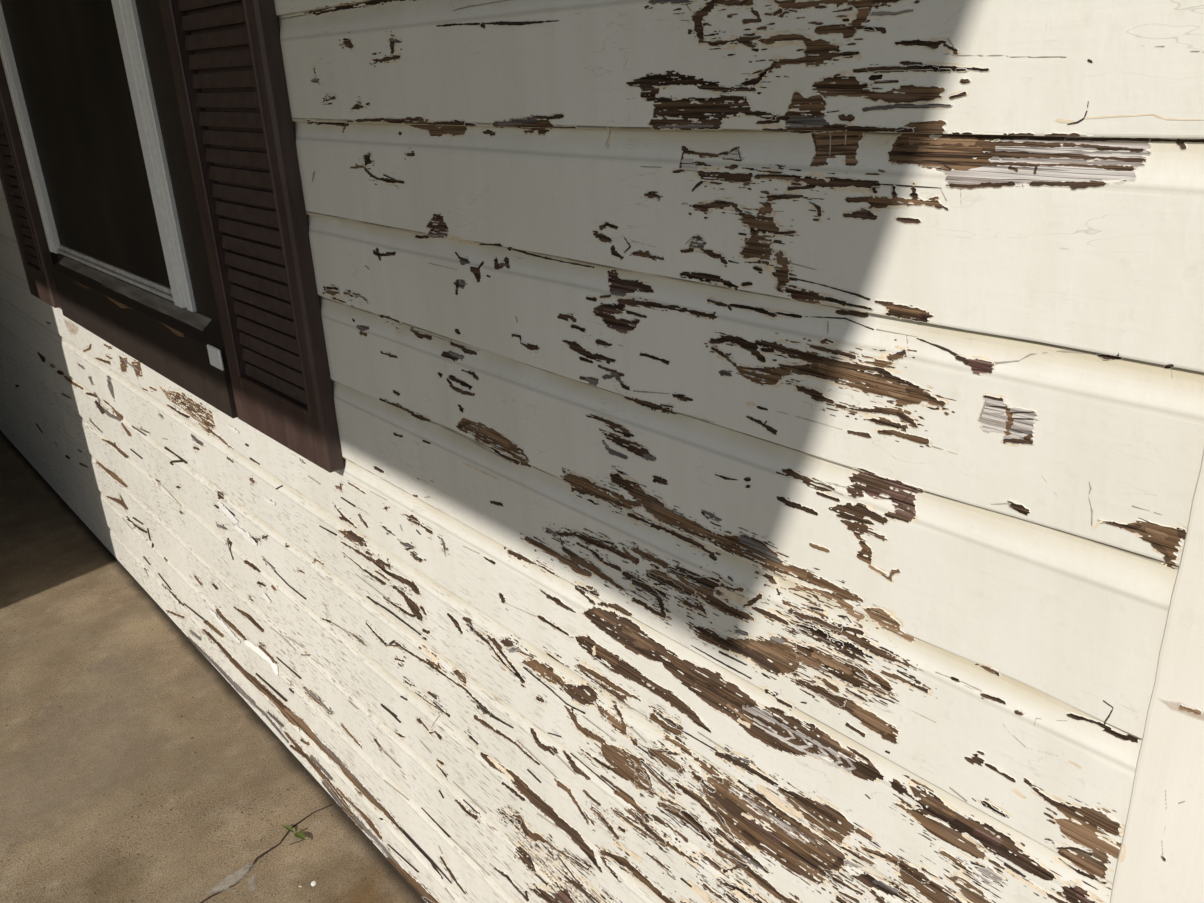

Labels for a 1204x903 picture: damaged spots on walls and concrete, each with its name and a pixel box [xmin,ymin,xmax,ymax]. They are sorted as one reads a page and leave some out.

peeling [305,96,580,138]
peeling [626,0,1204,323]
peeling [425,213,450,238]
peeling [429,252,511,296]
peeling [38,342,204,465]
peeling [438,328,533,468]
peeling [557,221,956,454]
peeling [977,393,1040,447]
peeling [954,350,1096,376]
peeling [1091,505,1187,569]
peeling [54,442,468,903]
crack [200,804,333,903]